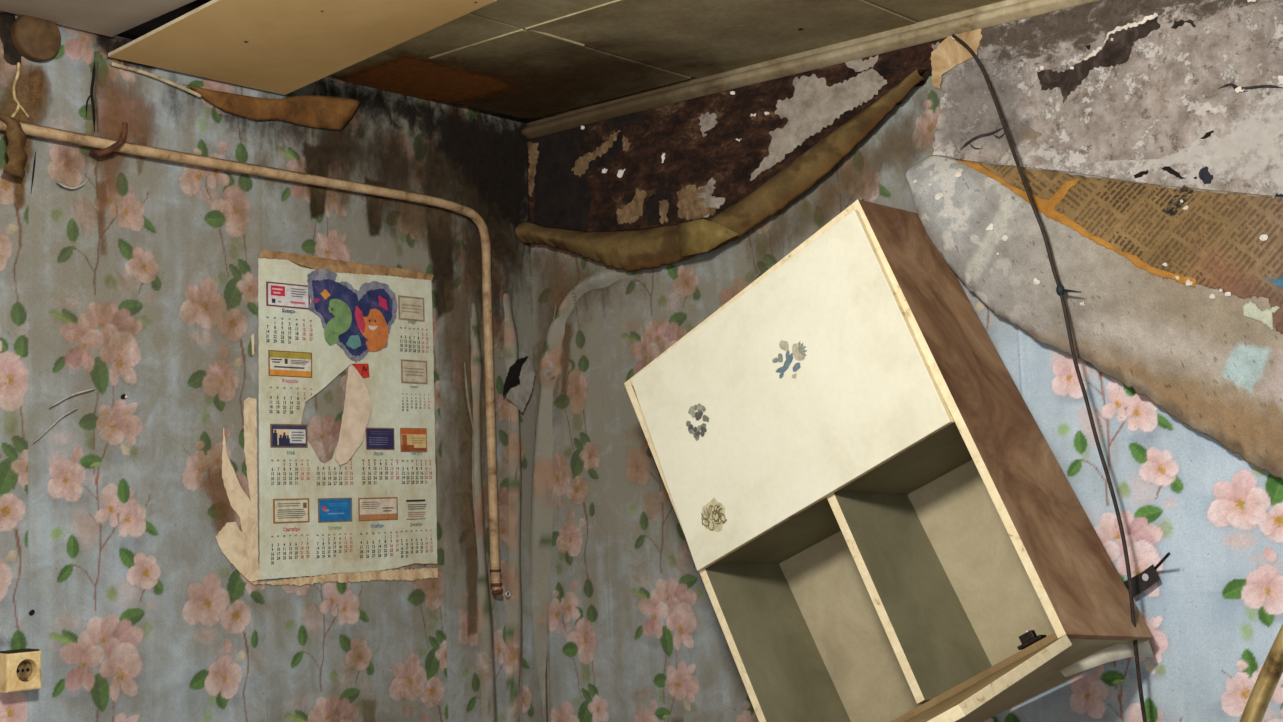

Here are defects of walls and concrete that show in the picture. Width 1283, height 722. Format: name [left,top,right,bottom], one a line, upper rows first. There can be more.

peeling [182,84,361,130]
flaking render [933,0,1283,196]
leakage [221,38,946,634]